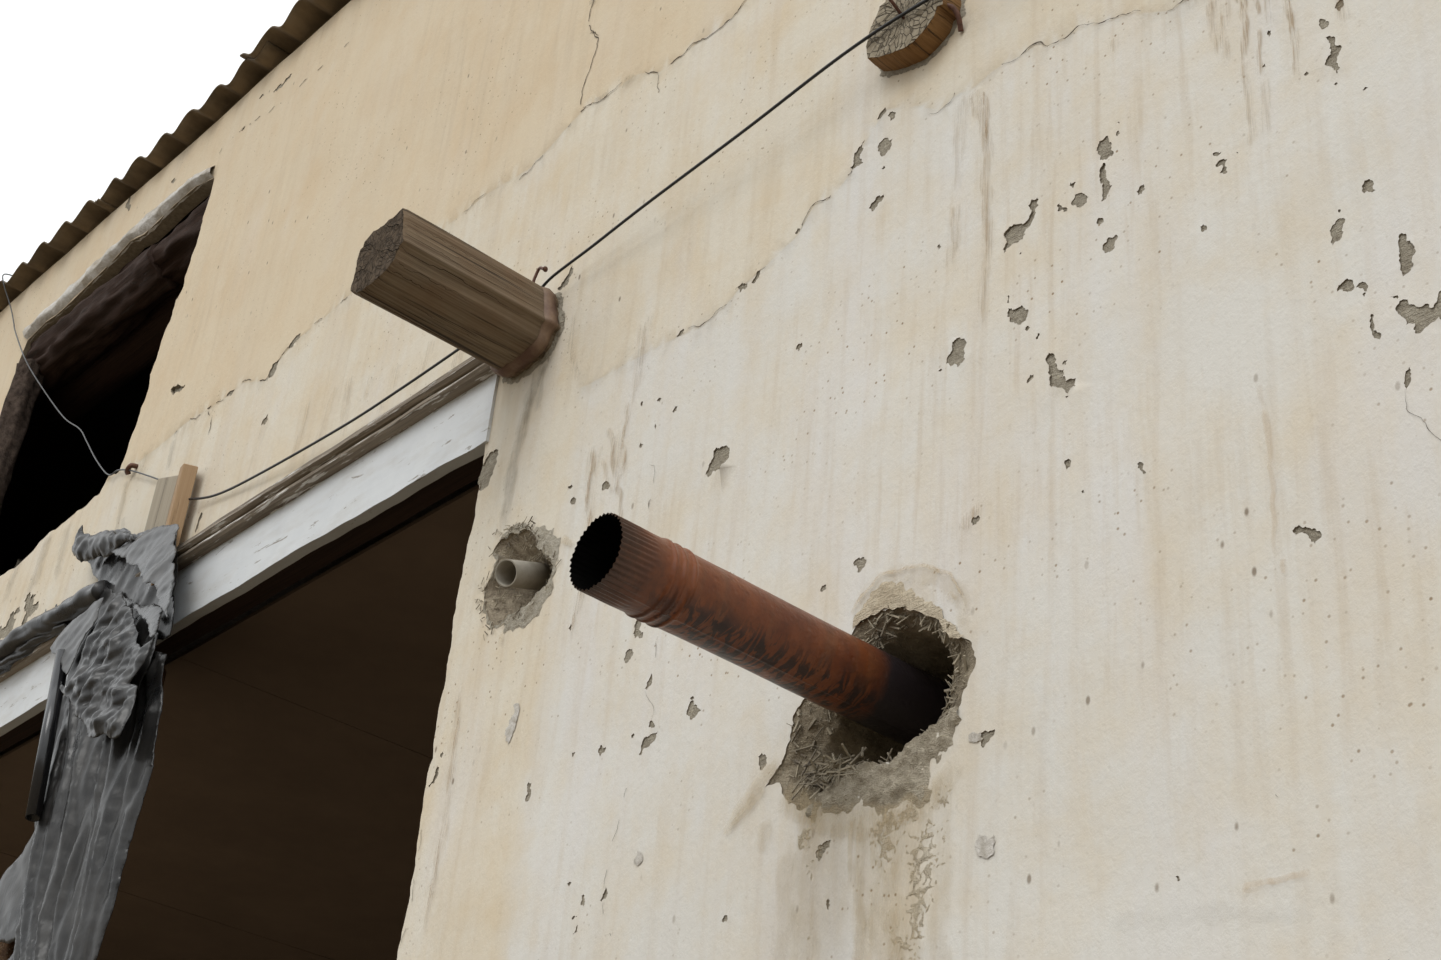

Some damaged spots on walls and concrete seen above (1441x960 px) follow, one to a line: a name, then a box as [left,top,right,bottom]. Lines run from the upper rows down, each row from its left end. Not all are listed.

crack [568,0,743,127]
peeling [1319,0,1344,85]
peeling [1004,199,1038,251]
peeling [1399,234,1416,276]
peeling [1008,296,1040,339]
peeling [1393,292,1441,334]
peeling [940,338,967,371]
peeling [1027,354,1075,398]
peeling [707,446,730,477]
peeling [1294,526,1322,542]
spalling [475,516,561,636]
spalling [759,581,976,960]